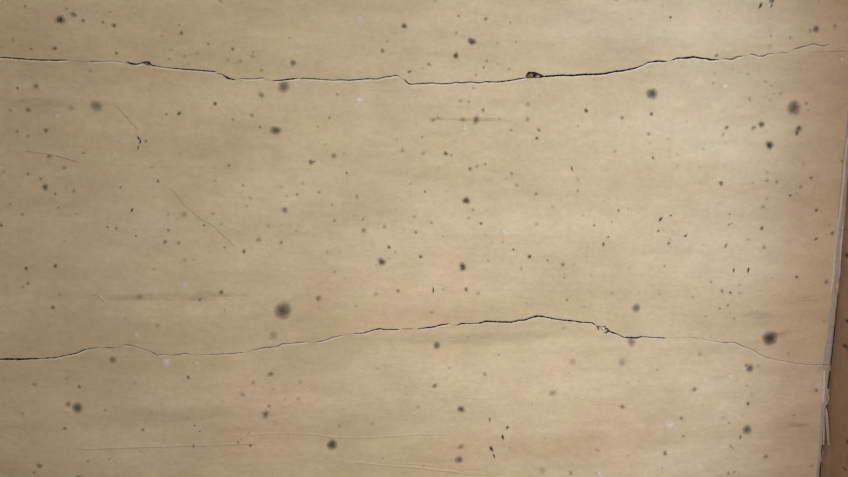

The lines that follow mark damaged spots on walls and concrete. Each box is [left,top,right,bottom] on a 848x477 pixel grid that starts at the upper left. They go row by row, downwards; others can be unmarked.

crack [0,43,830,86]
crack [0,293,839,408]